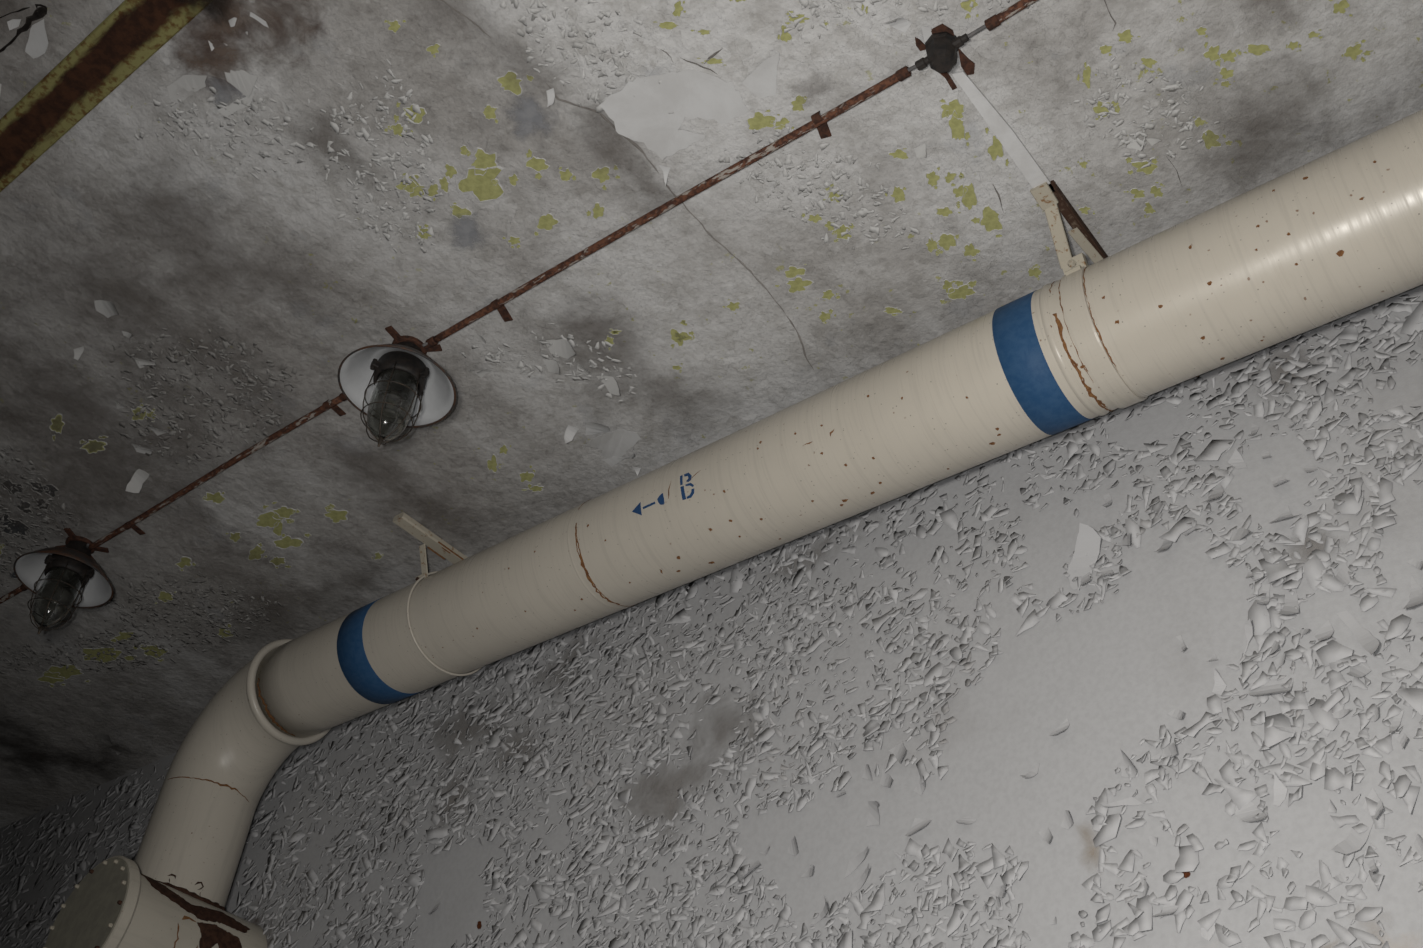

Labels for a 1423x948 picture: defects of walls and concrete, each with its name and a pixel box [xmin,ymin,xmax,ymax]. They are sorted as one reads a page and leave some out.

crack [0,4,47,53]
rust [177,0,319,78]
peeling [228,0,269,36]
peeling [134,59,621,253]
peeling [496,0,1010,262]
crack [546,83,814,370]
peeling [775,263,841,324]
peeling [940,279,977,304]
peeling [79,300,304,493]